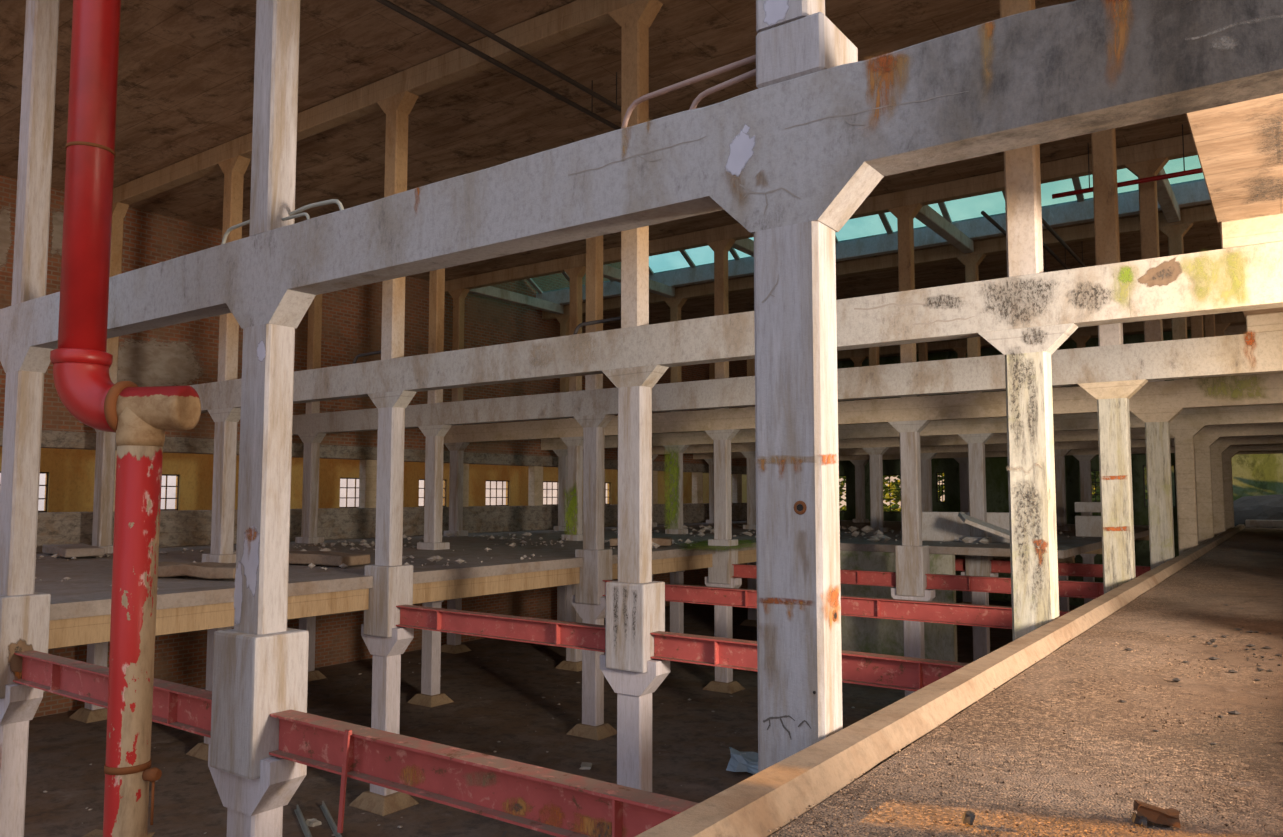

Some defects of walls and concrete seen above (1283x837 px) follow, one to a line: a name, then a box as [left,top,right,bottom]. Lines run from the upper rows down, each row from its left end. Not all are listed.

peeling [764,0,789,25]
rust [867,54,908,119]
peeling [726,125,755,176]
mould [927,295,959,308]
mould [1072,283,1110,309]
mould [987,280,1051,439]
water stain [1010,464,1043,591]
peeling [234,527,260,624]
rust [760,587,840,627]